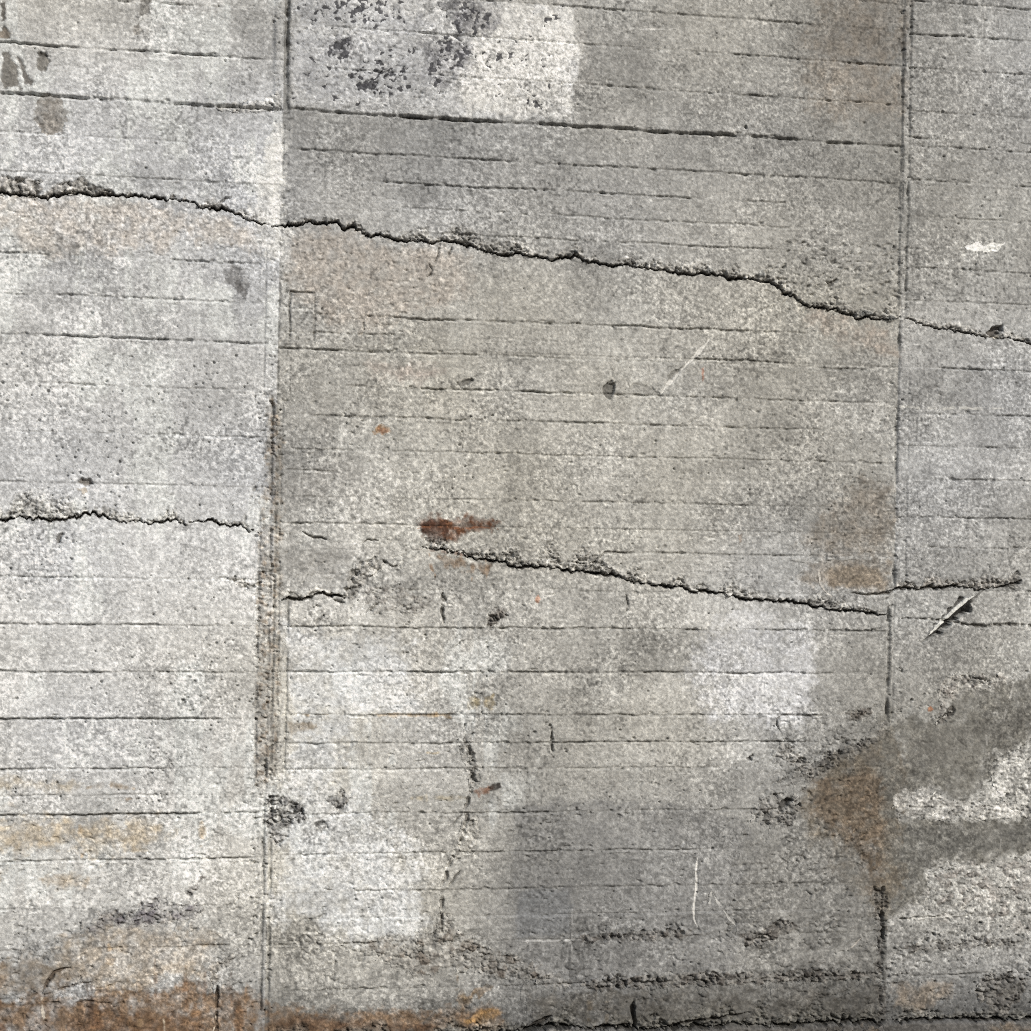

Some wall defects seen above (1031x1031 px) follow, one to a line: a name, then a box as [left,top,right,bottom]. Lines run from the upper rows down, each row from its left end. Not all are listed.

crack [0,184,1031,345]
crack [0,485,260,534]
crack [305,532,327,540]
crack [281,539,399,613]
corrosion [415,511,502,582]
crack [420,528,1031,628]
water stain [509,667,1031,1031]
corrosion [0,911,515,1031]
crack [476,1016,1031,1031]
corrosion [987,1019,1031,1031]